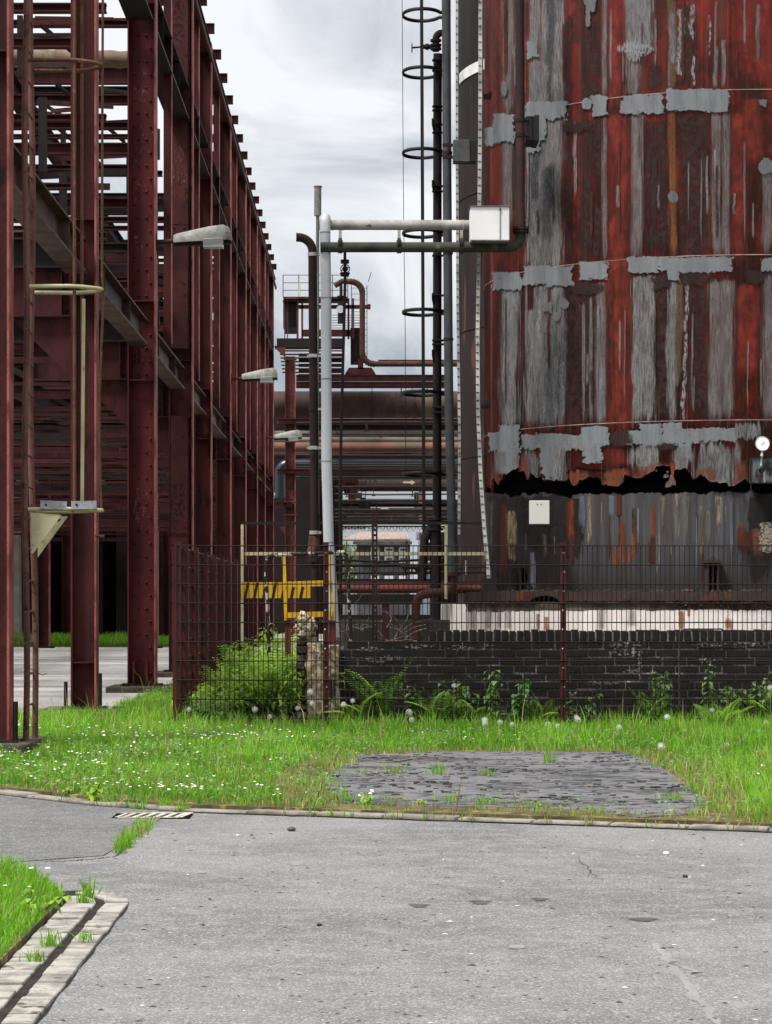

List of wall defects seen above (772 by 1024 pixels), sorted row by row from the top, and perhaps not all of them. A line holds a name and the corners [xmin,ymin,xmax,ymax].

rust [667,0,677,88]
peeling [484,100,569,154]
peeling [582,88,730,117]
rust [668,113,677,255]
peeling [491,261,609,291]
peeling [626,256,734,281]
rust [671,281,684,386]
peeling [488,424,610,480]
rust [570,470,589,485]
peeling [625,421,761,459]
rust [696,468,715,482]
rust [603,463,674,572]